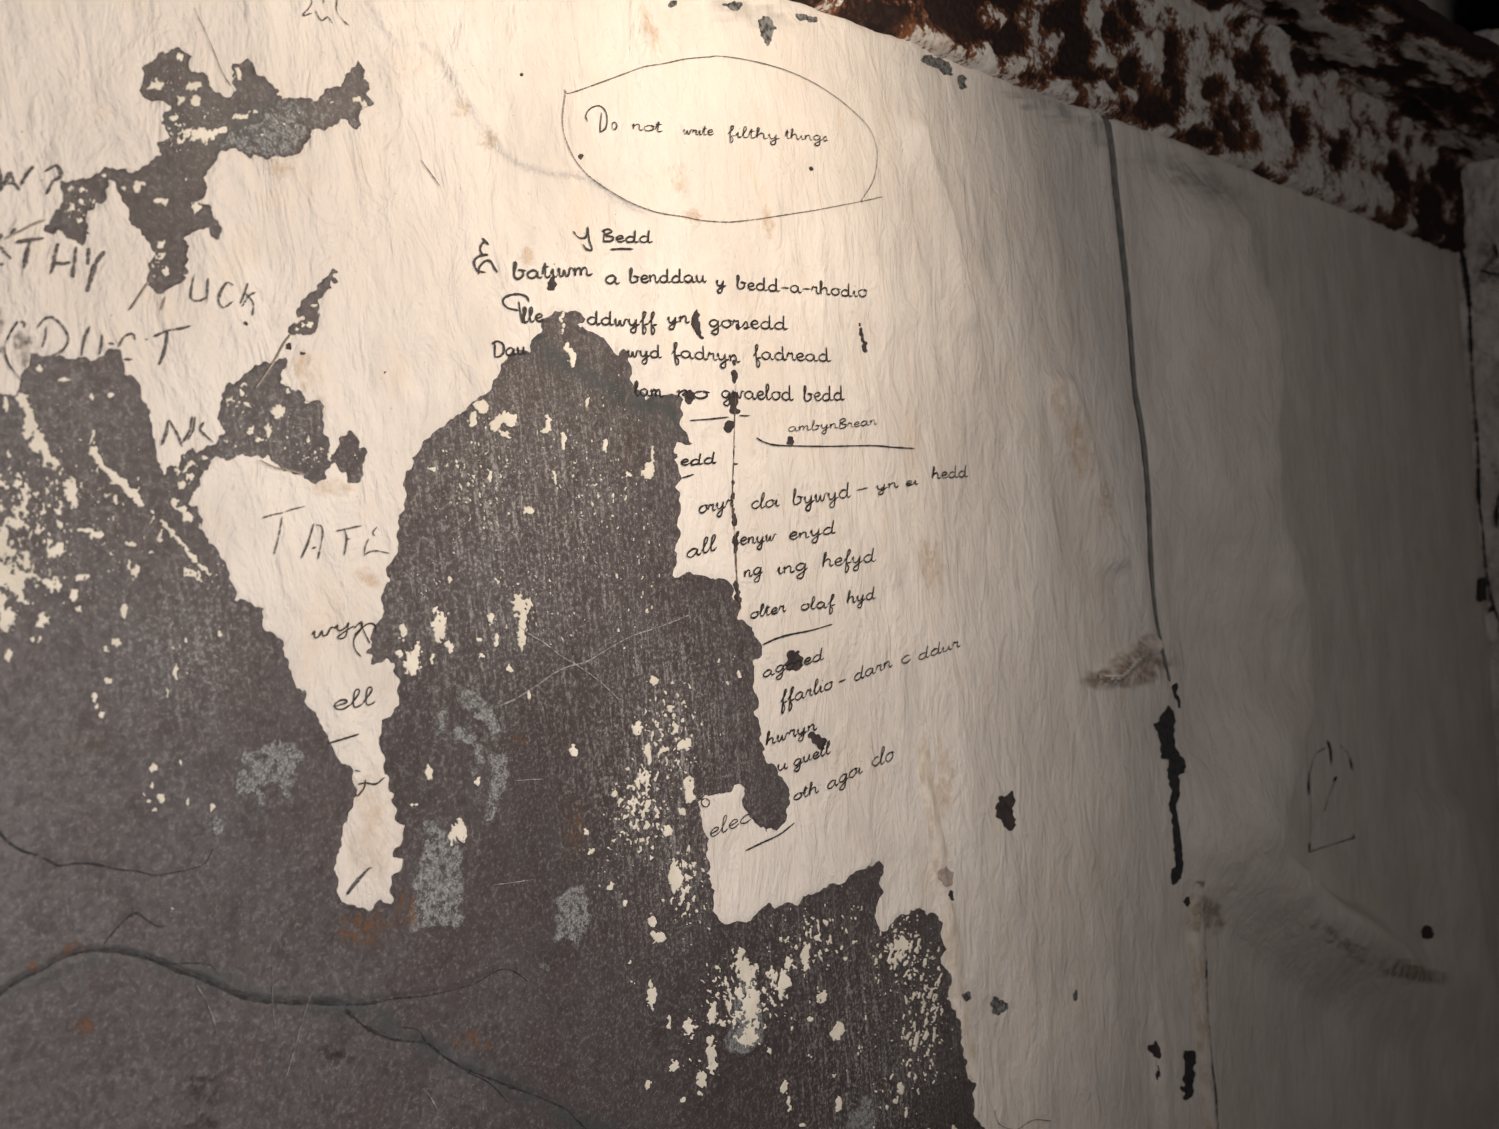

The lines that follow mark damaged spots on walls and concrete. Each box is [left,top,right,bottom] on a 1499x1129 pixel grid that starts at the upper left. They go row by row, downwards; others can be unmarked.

peeling [44,47,374,294]
peeling [0,269,985,1129]
crack [0,831,213,876]
spalling [995,791,1016,831]
crack [0,911,587,1129]
spalling [990,996,1008,1015]